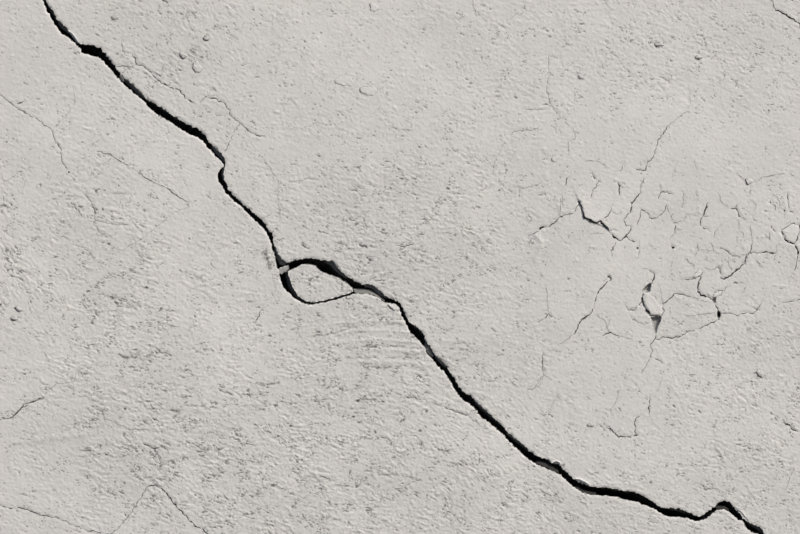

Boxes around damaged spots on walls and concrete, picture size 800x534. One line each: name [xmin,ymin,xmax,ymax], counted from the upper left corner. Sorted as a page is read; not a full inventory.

crack [1,90,75,168]
crack [132,56,192,102]
crack [493,56,576,168]
crack [74,134,190,250]
crack [512,91,800,463]
crack [0,364,86,420]
crack [100,413,169,460]
crack [1,485,208,534]